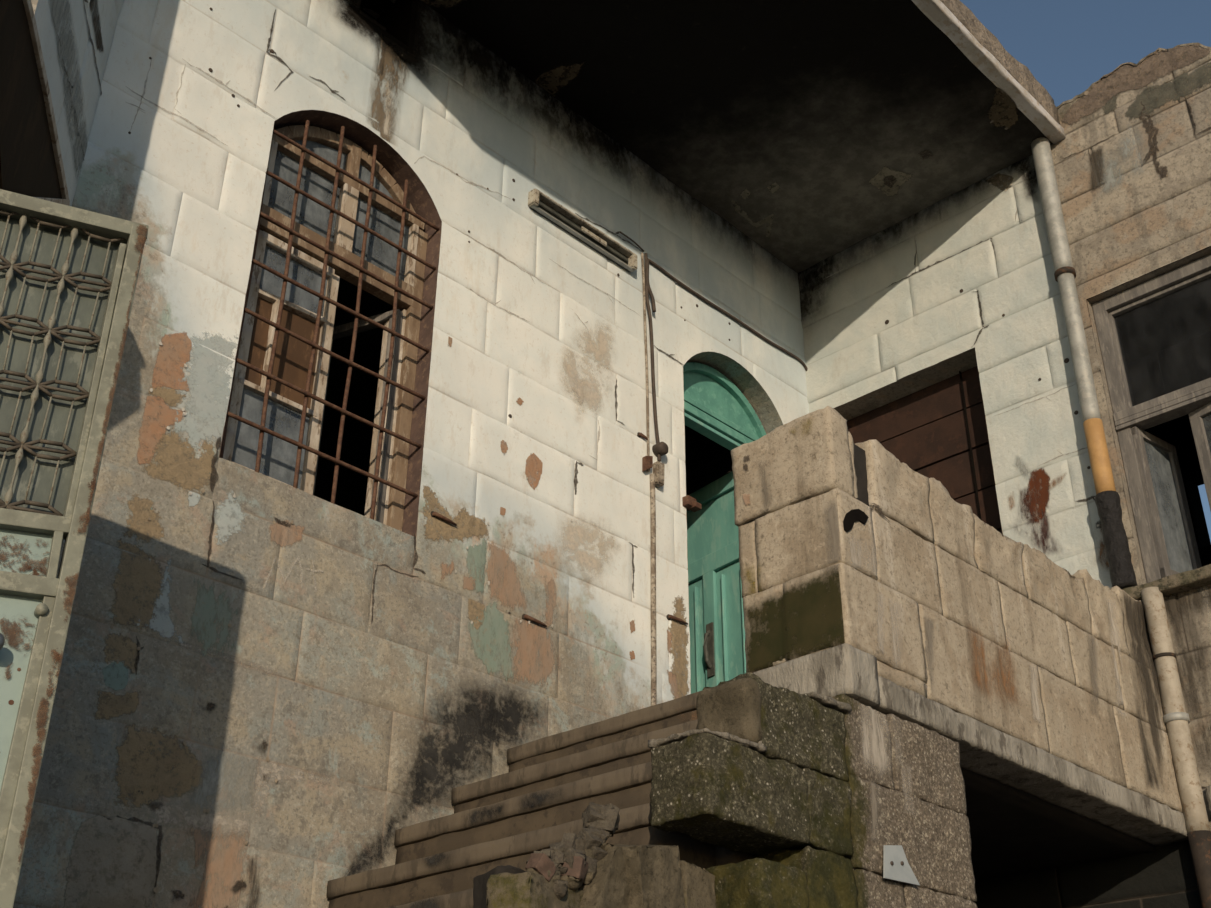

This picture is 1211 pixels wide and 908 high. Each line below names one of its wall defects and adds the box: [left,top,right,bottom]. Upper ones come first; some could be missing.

crack [266,9,345,100]
water stain [371,39,425,142]
peeling [137,332,238,507]
peeling [525,453,543,489]
peeling [562,519,614,572]
corrosion [1009,458,1062,552]
peeling [667,595,689,699]
water stain [348,689,538,876]